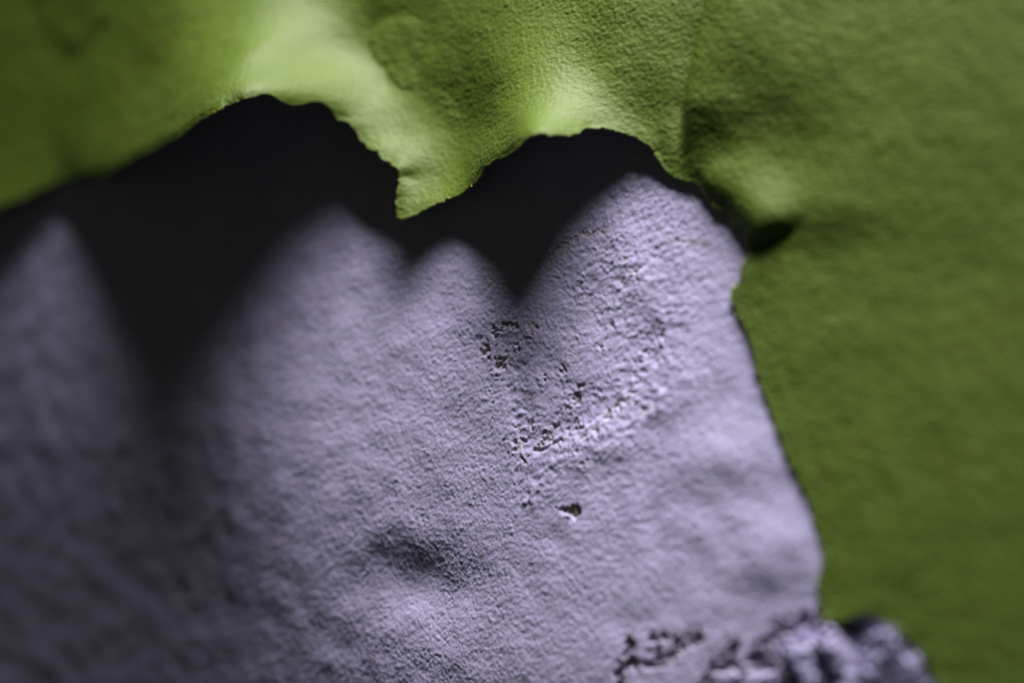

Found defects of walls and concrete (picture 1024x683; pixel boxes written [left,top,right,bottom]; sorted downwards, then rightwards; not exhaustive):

peeling [0,0,685,220]
spalling [469,312,549,382]
spalling [506,314,674,482]
spalling [610,248,649,293]
peeling [670,0,1024,683]
spalling [550,497,586,524]